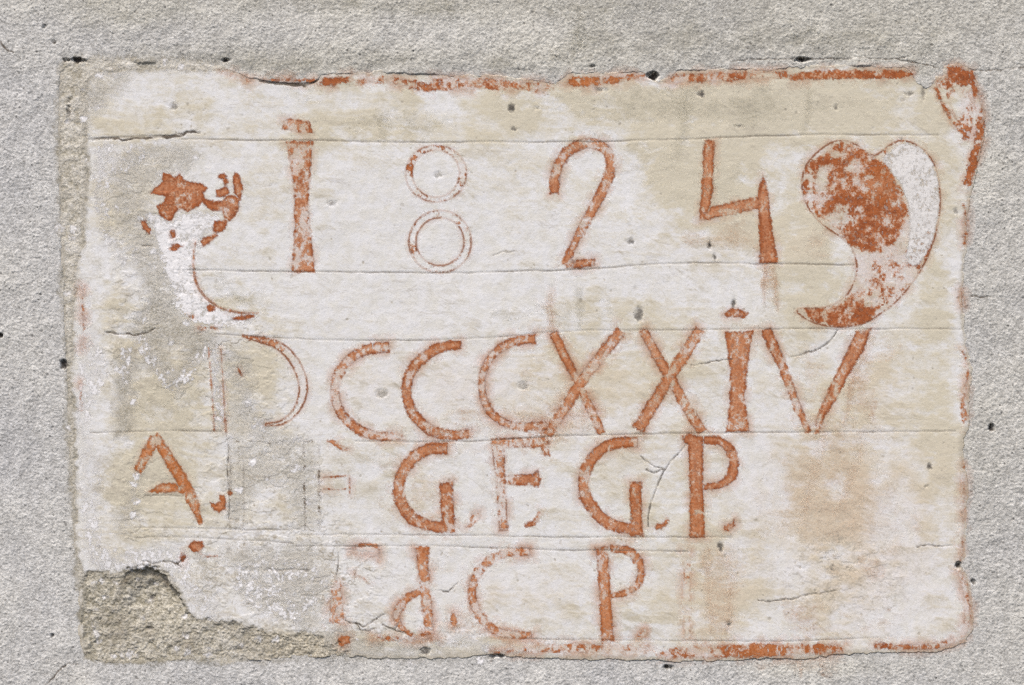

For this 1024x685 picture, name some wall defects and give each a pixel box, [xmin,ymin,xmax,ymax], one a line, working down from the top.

crack [113,130,197,141]
spalling [55,56,223,524]
spalling [74,553,279,665]
peeling [236,555,330,622]